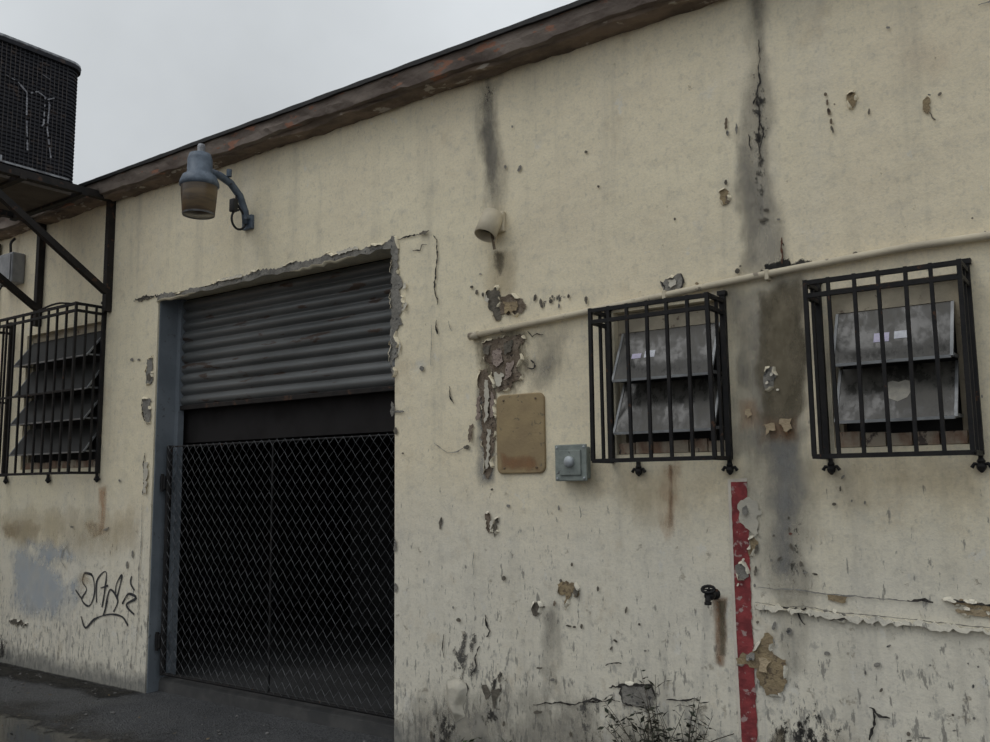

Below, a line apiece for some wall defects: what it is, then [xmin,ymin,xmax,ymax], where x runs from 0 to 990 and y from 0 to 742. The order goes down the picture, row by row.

crack [748,40,764,167]
water stain [480,117,498,193]
water stain [748,74,812,272]
spalling [156,235,407,378]
crack [398,230,452,365]
spalling [470,285,570,321]
peeling [468,334,526,491]
water stain [453,627,479,687]
rust [715,600,726,664]
spalling [736,621,792,698]
crack [533,697,620,706]
water stain [771,704,842,742]